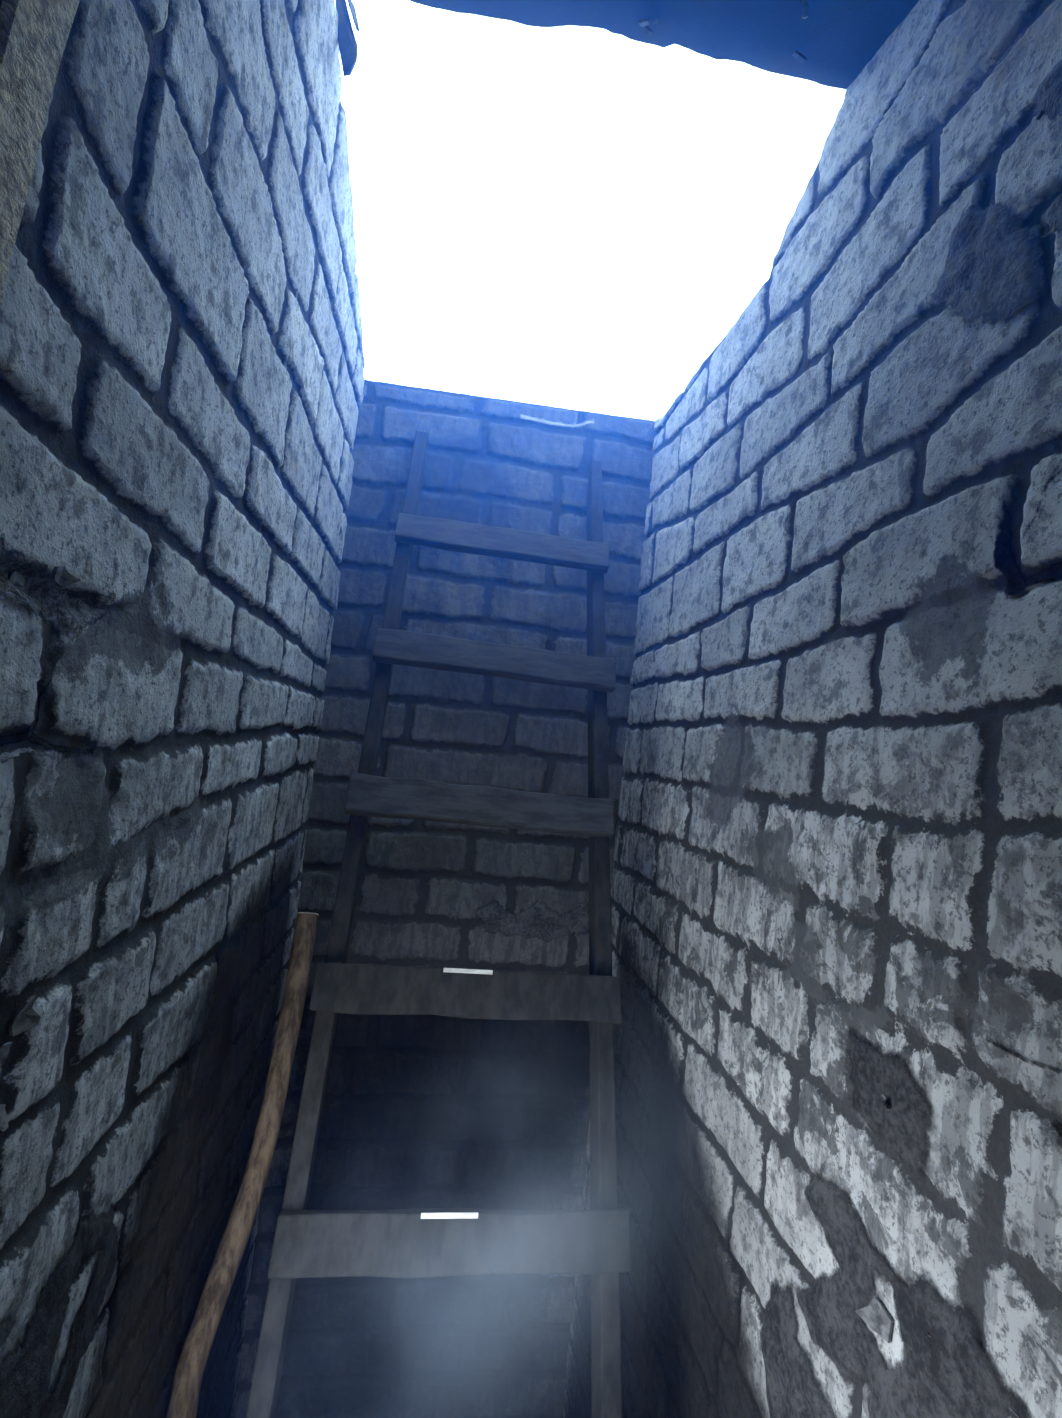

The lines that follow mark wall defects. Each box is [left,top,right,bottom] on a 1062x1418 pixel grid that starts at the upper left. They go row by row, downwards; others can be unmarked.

spalling [0,530,105,636]